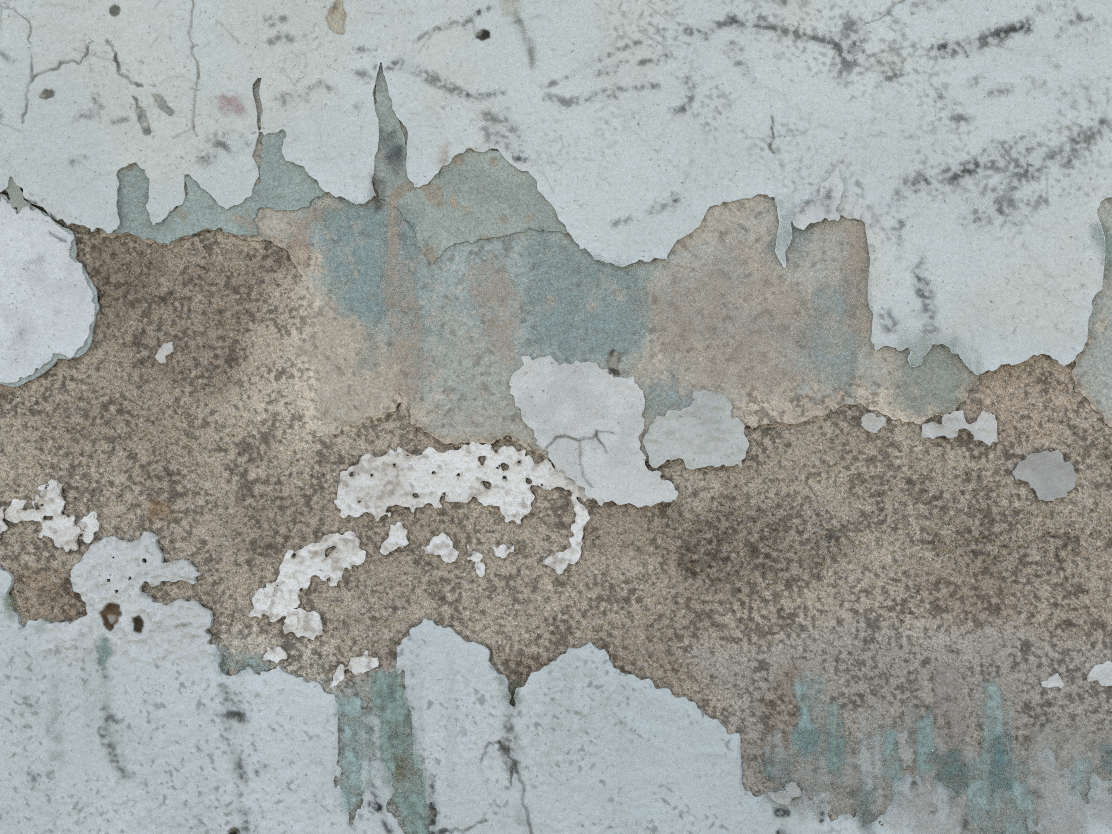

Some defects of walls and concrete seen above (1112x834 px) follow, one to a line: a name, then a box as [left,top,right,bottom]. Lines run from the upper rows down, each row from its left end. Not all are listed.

peeling [100,63,979,469]
spalling [0,177,1112,834]
water stain [360,670,428,834]
water stain [766,667,983,834]
water stain [1026,725,1112,834]